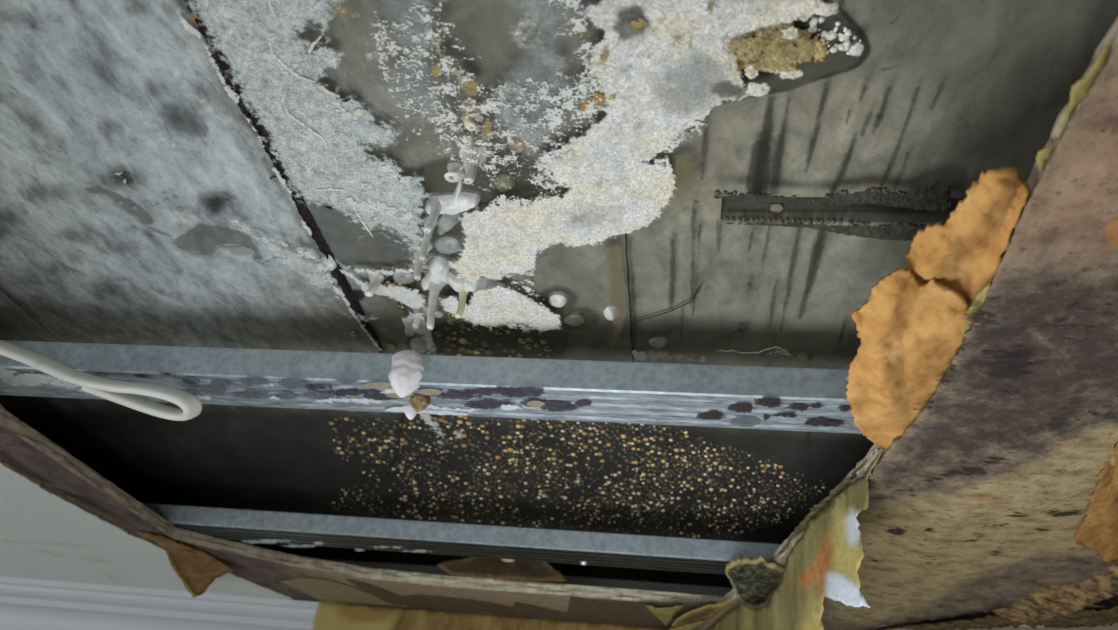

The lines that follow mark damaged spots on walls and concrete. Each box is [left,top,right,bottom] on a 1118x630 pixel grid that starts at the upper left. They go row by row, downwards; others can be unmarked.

damp [829,87,890,198]
damp [86,0,870,355]
mould [966,302,995,327]
mould [923,457,1008,482]
damp [993,500,1081,532]